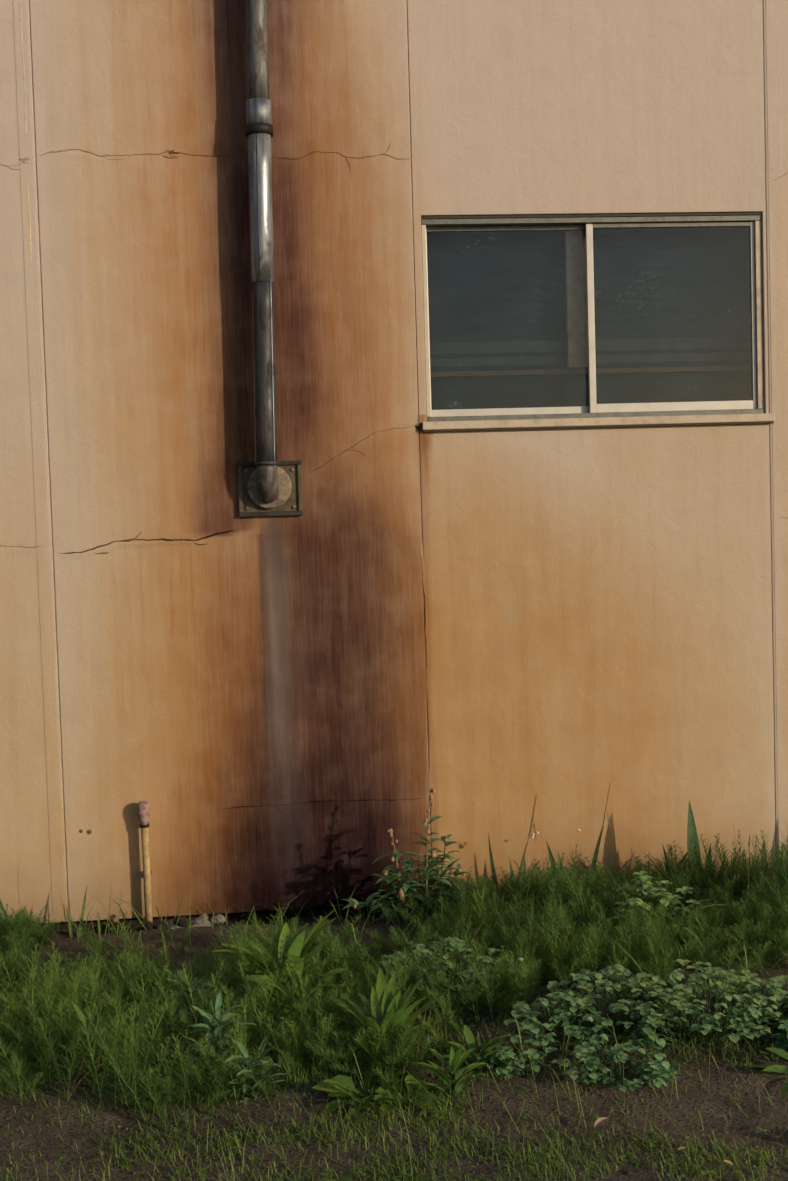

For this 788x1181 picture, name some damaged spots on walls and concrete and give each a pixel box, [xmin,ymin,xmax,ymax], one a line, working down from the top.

crack [36,149,238,166]
crack [274,145,410,167]
crack [58,530,237,560]